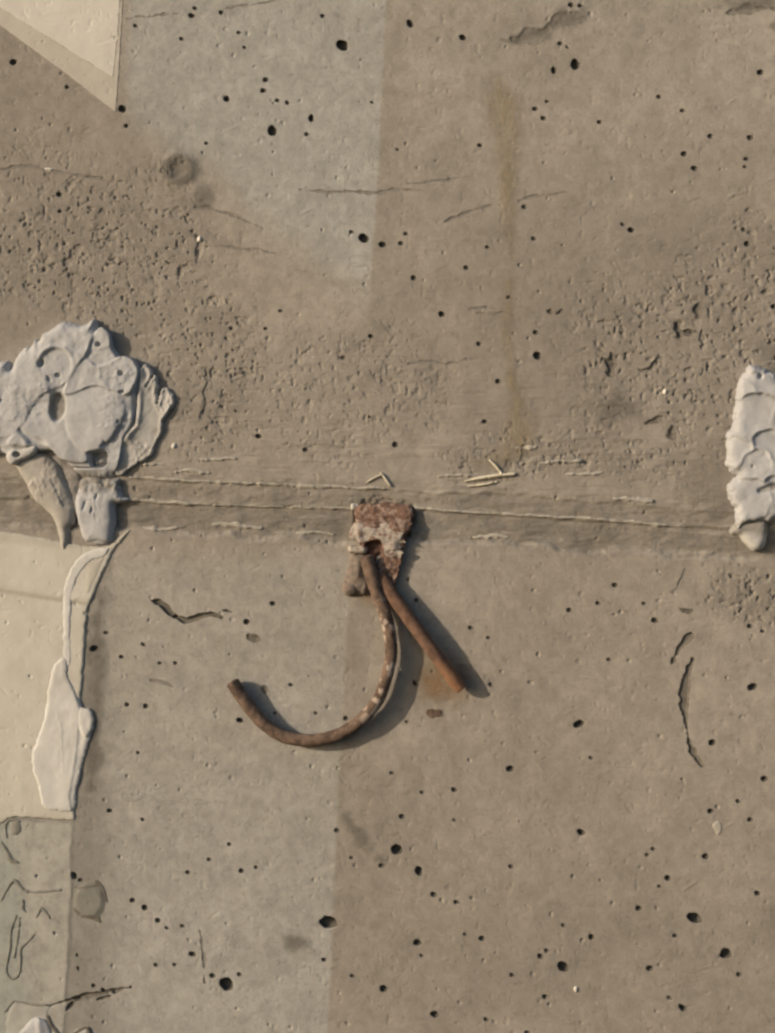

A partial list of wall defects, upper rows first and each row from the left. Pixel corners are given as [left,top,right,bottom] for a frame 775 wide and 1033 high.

crack [151,599,232,624]
corrosion [426,709,442,718]
crack [671,632,703,767]
peeling [4,1000,58,1033]